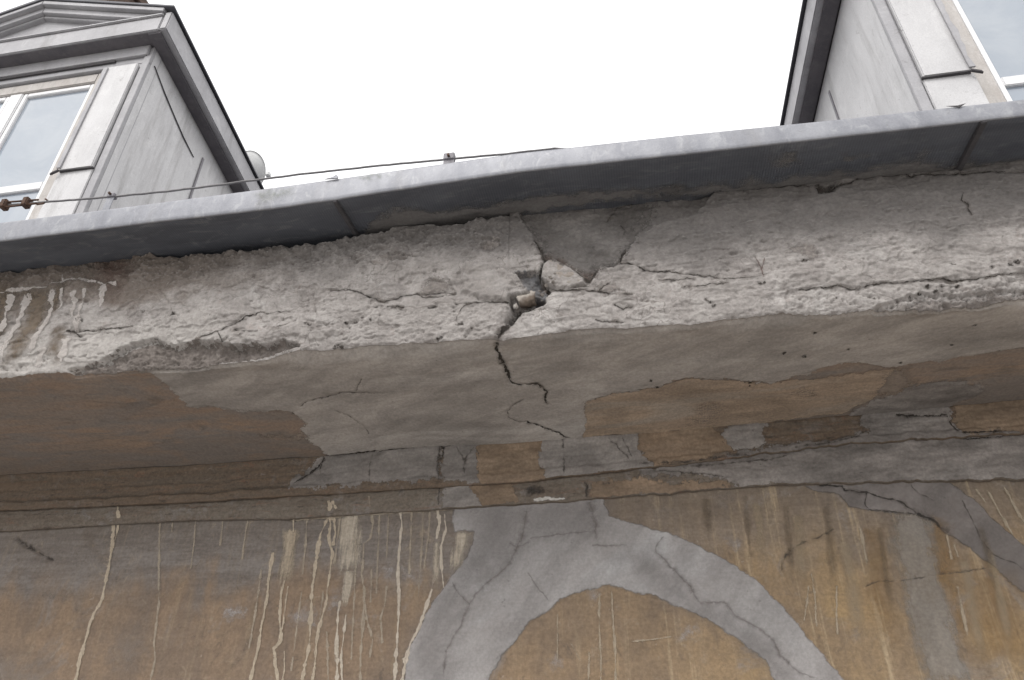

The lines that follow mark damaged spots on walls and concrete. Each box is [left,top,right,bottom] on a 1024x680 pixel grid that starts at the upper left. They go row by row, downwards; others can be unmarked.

water stain [0,274,116,367]
crack [66,326,130,338]
crack [201,311,284,342]
spalling [507,270,548,326]
crack [799,273,1012,291]
crack [338,289,565,471]
crack [296,448,404,482]
water stain [74,506,121,680]
water stain [248,496,466,680]